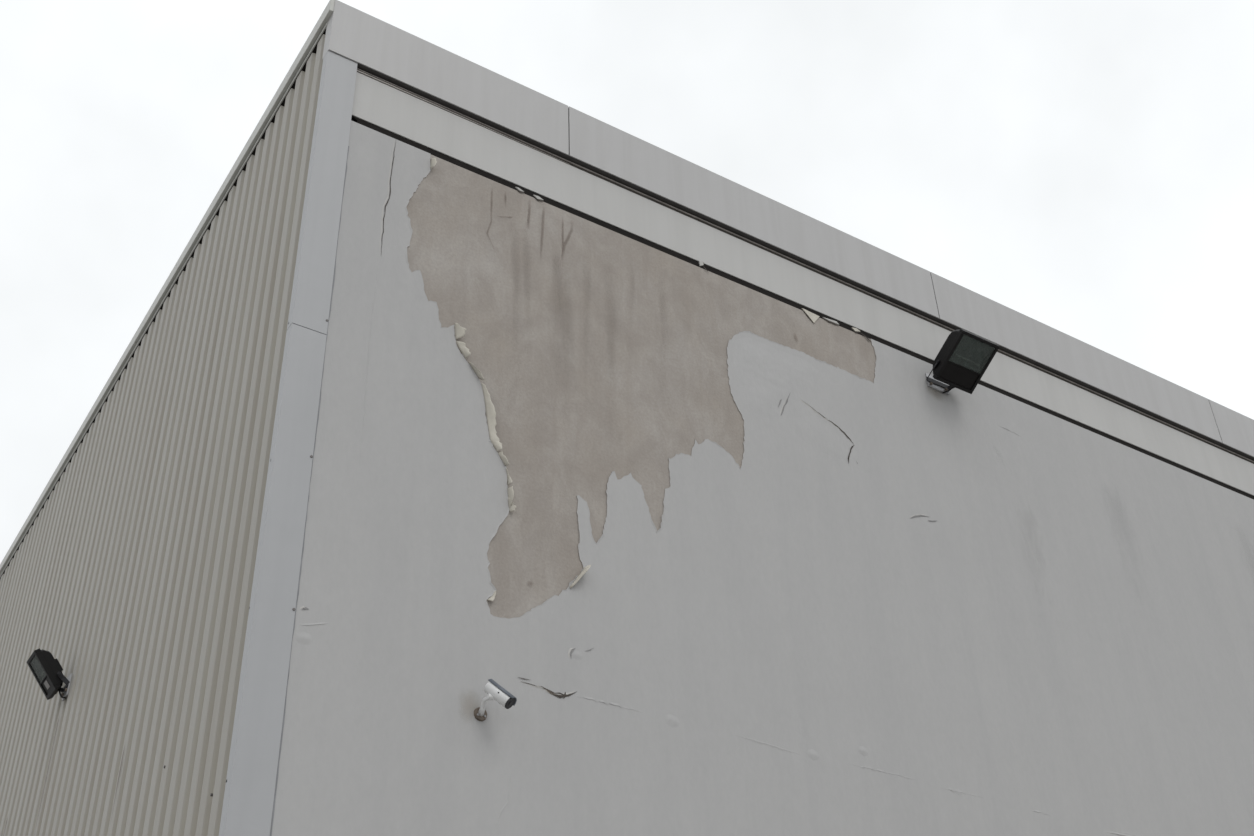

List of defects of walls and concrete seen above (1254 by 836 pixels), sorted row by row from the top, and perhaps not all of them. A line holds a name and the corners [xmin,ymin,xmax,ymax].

crack [380,140,396,253]
peeling [404,154,877,619]
crack [778,394,854,462]
crack [518,677,576,699]